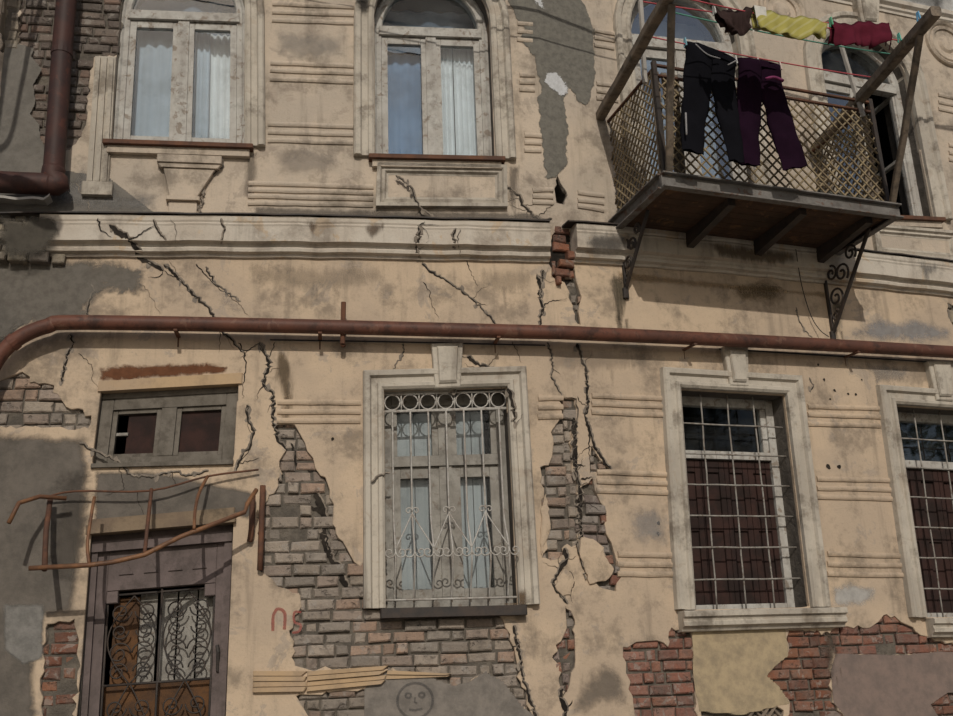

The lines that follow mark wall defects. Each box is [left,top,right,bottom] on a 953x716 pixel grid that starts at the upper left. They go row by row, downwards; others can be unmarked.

flaking render [66,0,124,150]
crack [396,175,497,324]
flaking render [0,373,91,430]
crack [71,182,352,588]
flaking render [261,425,529,711]
crack [462,342,522,429]
crack [536,269,613,604]
flaking render [540,397,621,591]
flaking render [40,621,80,716]
crack [510,625,539,716]
crack [558,675,572,716]
flaking render [623,615,953,716]